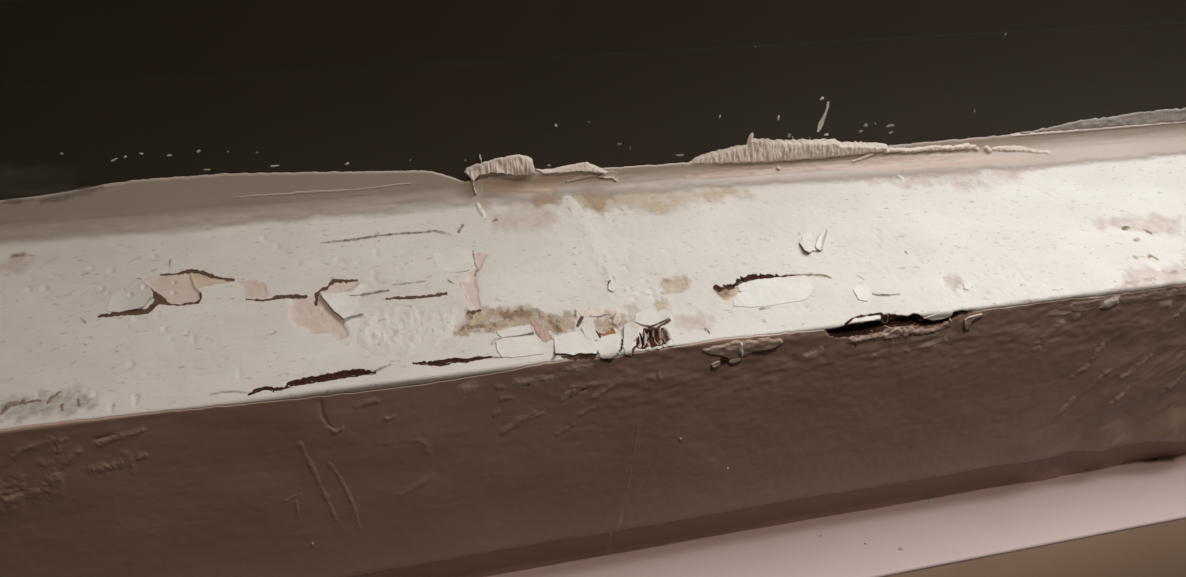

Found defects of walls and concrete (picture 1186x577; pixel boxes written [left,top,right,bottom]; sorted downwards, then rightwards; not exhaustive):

peeling [688,132,888,165]
peeling [464,154,607,195]
peeling [98,261,367,340]
peeling [432,249,489,311]
peeling [800,275,1186,362]
crack [248,368,381,396]
crack [413,356,503,367]
spalling [494,307,674,392]
peeling [702,337,783,367]